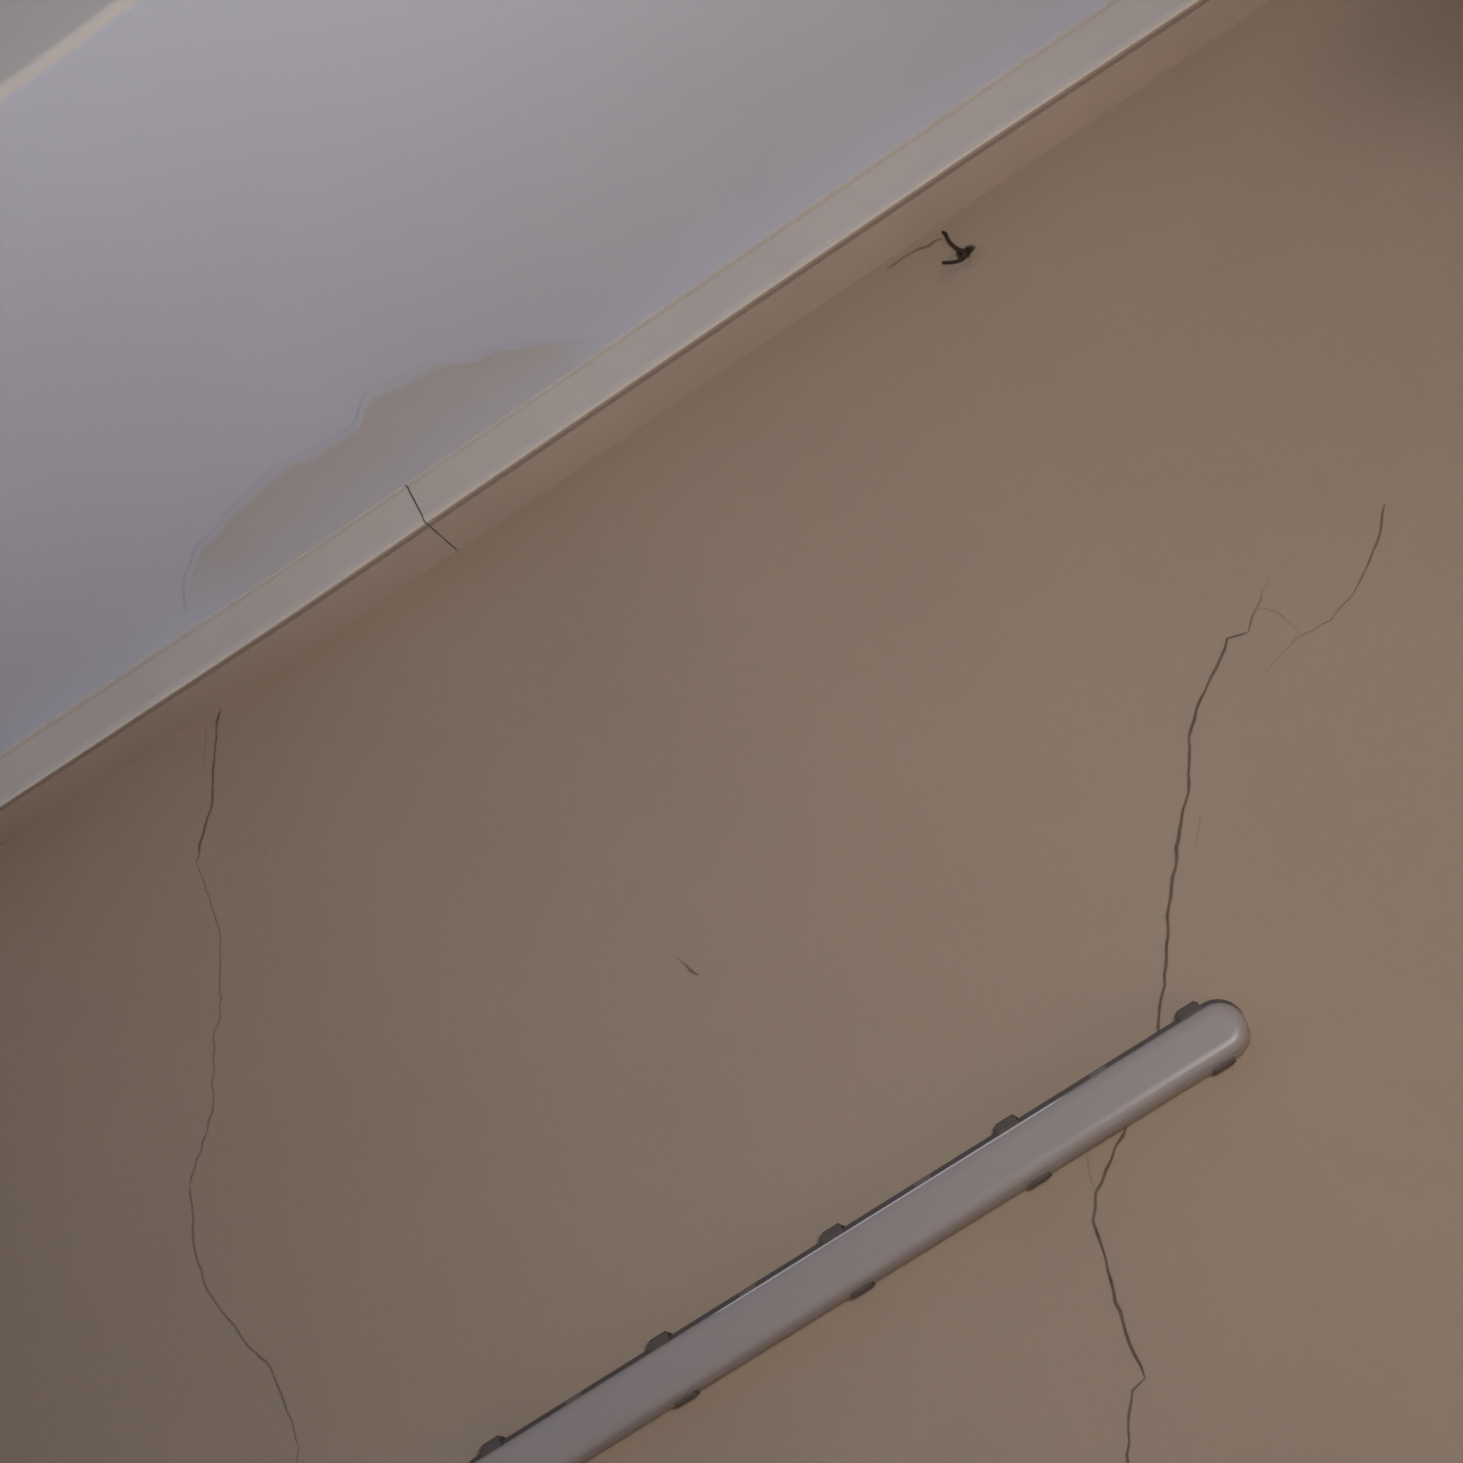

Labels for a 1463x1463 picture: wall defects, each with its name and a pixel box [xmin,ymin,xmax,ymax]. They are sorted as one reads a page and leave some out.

leakage [183,341,600,621]
crack [1157,696,1203,1031]
crack [1103,1126,1127,1176]
crack [1092,1220,1145,1389]